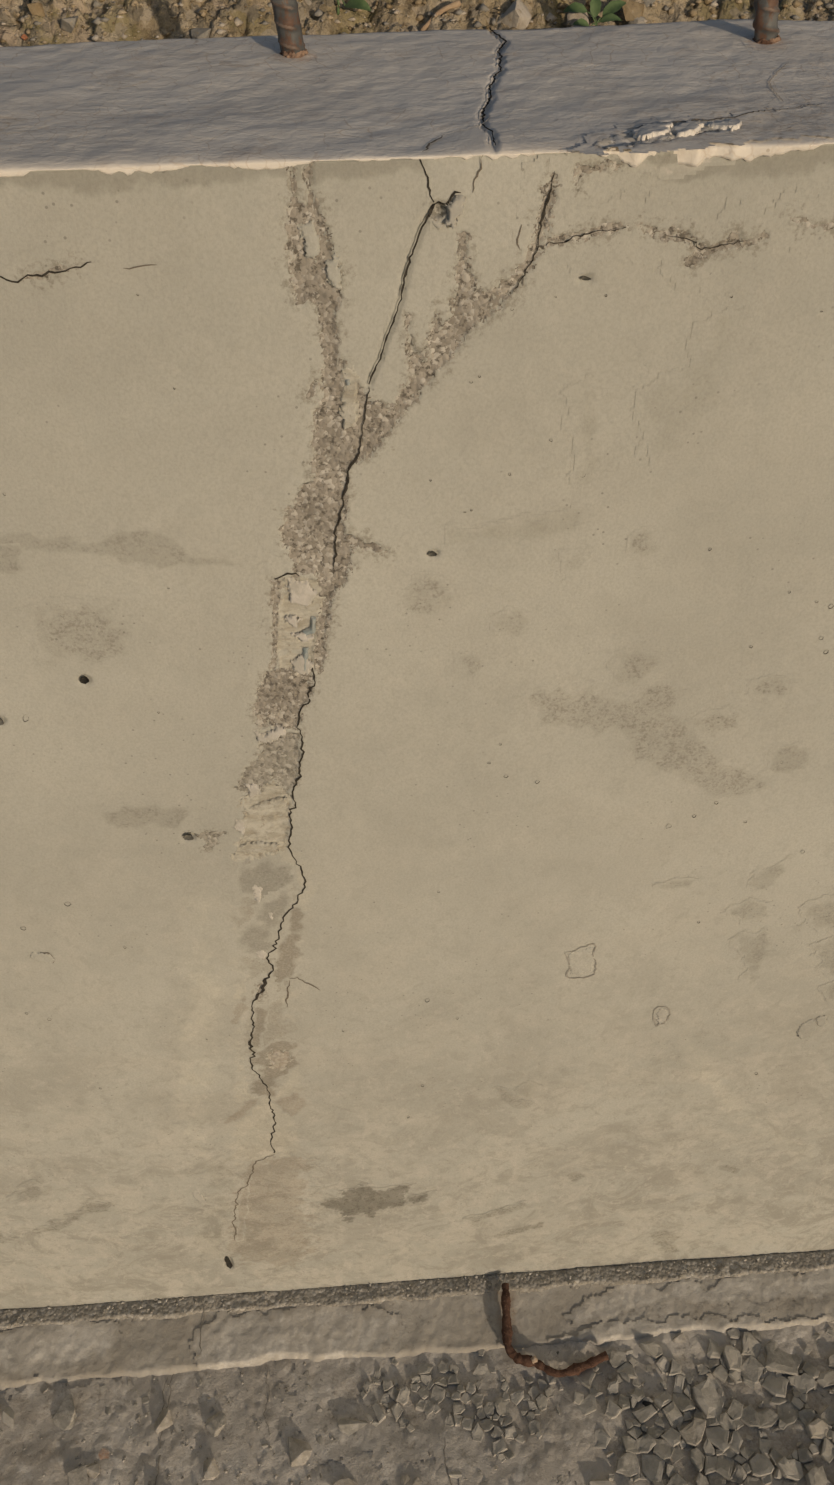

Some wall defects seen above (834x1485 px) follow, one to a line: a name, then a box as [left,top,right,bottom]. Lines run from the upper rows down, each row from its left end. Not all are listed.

crack [629,62,819,129]
crack [0,239,153,309]
crack [333,27,507,569]
crack [512,172,834,293]
spalling [100,105,834,1272]
crack [232,668,321,1240]
damp [311,1182,435,1225]
corrosion [490,1279,523,1349]